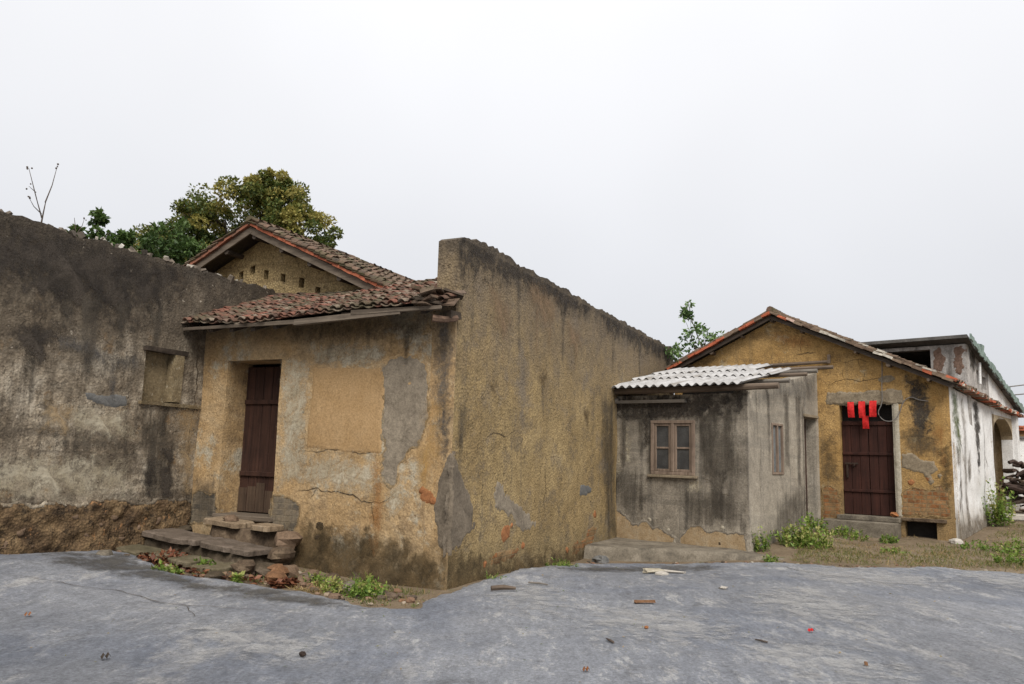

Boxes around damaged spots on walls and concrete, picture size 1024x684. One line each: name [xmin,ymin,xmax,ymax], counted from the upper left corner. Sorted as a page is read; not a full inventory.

damp [0,220,190,382]
spalling [933,346,967,375]
damp [0,406,127,497]
damp [145,409,212,511]
crack [301,487,395,519]
spalling [387,484,436,513]
damp [294,522,646,590]
peeling [616,509,751,552]
damp [604,376,814,544]
spalling [901,453,956,519]
damp [903,375,993,540]